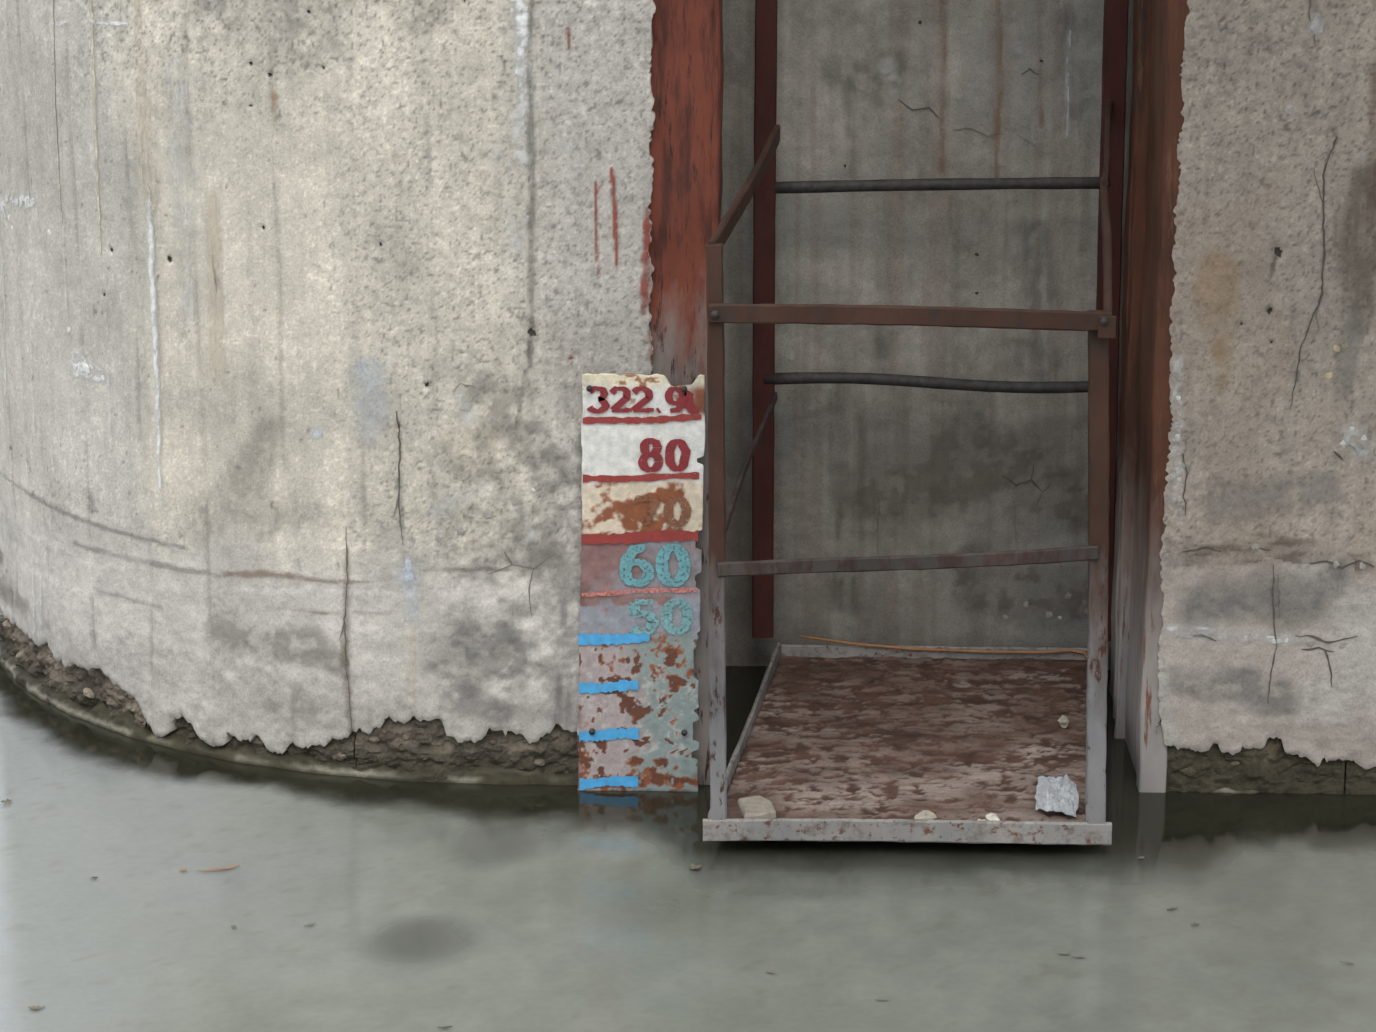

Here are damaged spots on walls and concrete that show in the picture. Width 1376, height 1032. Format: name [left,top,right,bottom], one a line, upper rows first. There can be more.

crack [1290,137,1338,409]
spalling [0,619,152,733]
crack [339,541,352,729]
crack [1267,565,1280,704]
spalling [175,716,579,782]
spalling [1166,737,1376,795]